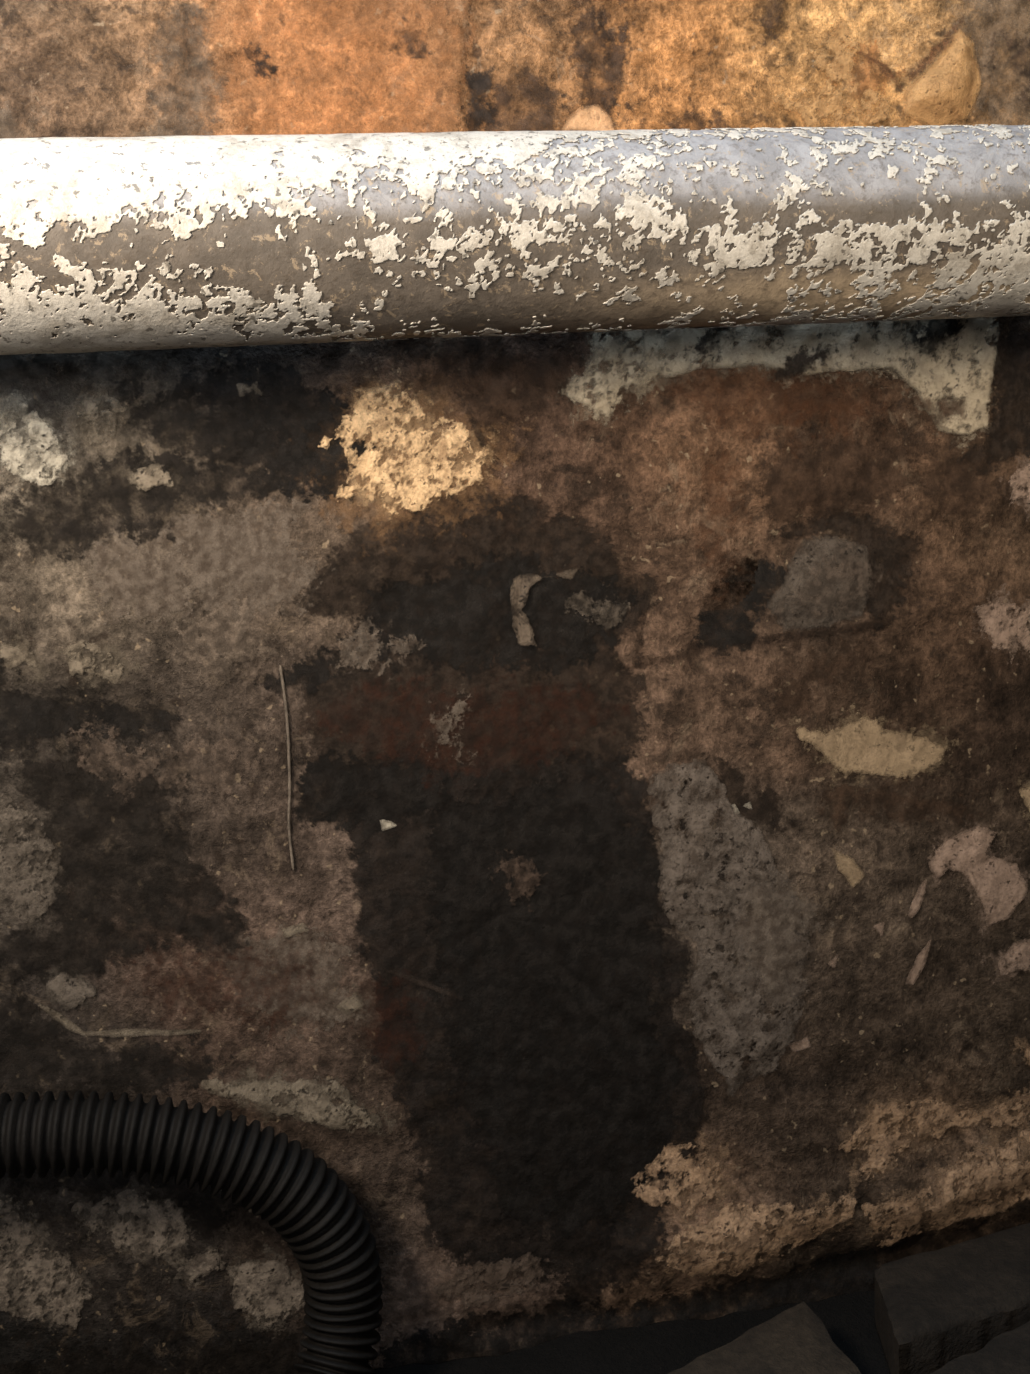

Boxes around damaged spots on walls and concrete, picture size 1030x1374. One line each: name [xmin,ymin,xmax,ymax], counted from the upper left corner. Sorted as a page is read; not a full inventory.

peeling [0,17,1030,447]
peeling [115,466,173,489]
peeling [59,499,319,690]
peeling [318,382,492,524]
leakage [759,325,1030,719]
peeling [797,705,958,782]
leakage [253,480,1030,1370]